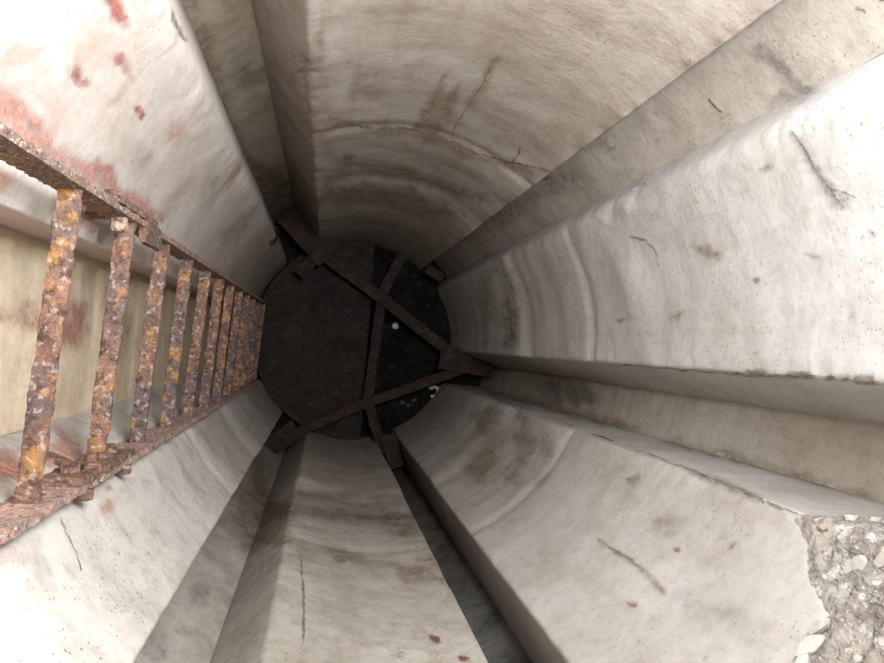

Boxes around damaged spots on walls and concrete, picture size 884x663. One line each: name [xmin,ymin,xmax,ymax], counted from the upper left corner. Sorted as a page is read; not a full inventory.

corrosion [108,0,128,21]
corrosion [0,92,164,222]
crack [338,103,553,173]
crack [793,133,847,202]
corrosion [45,429,81,466]
crack [299,561,307,642]
spalling [790,510,884,663]